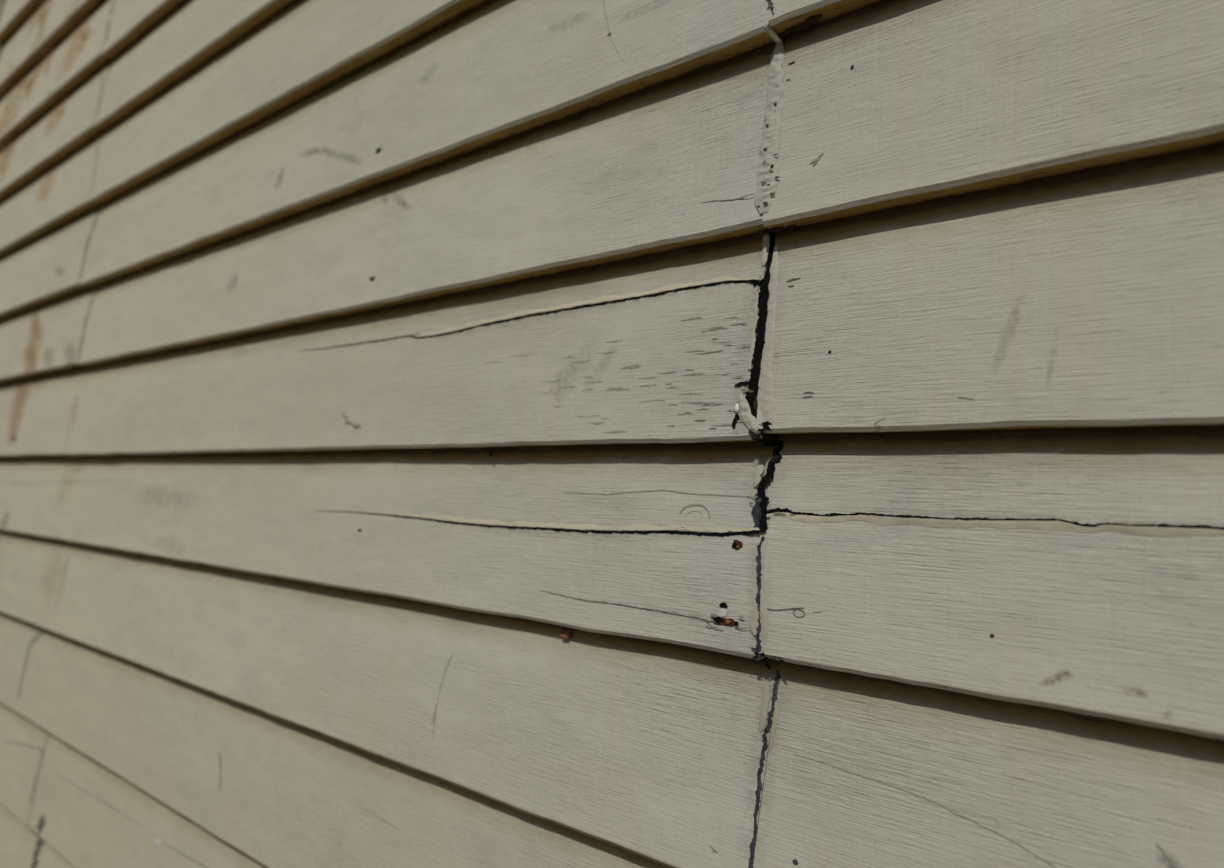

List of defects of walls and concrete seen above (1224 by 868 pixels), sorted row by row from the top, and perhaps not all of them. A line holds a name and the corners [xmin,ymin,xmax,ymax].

crack [702,193,755,203]
crack [300,226,1224,868]